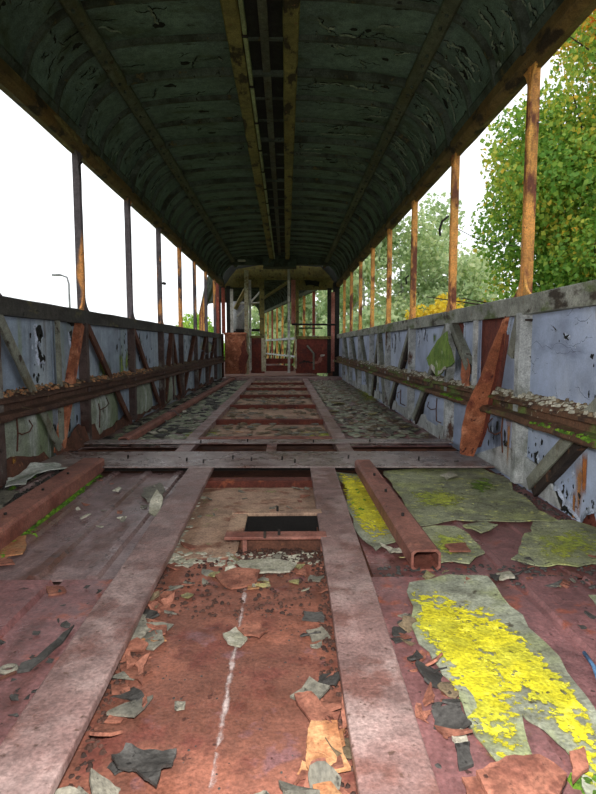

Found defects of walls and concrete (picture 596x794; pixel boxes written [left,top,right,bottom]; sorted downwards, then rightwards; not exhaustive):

rust [481,317,512,387]
peeling [553,470,596,527]
rust [89,589,177,736]